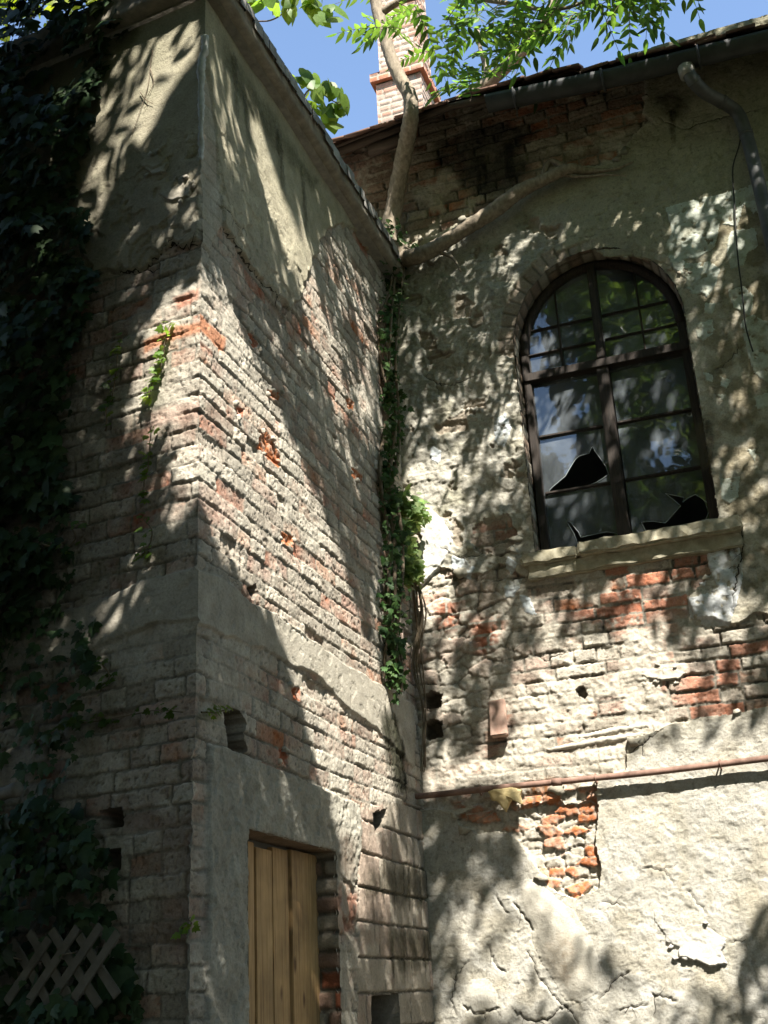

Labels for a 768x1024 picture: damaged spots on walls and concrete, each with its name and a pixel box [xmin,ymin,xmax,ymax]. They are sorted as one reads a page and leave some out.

water stain [436,124,538,192]
spalling [246,328,263,351]
spalling [266,388,285,401]
peeling [430,446,441,464]
spalling [408,508,768,900]
crack [442,898,577,1024]
flaking render [653,910,727,967]
crack [599,971,673,1015]